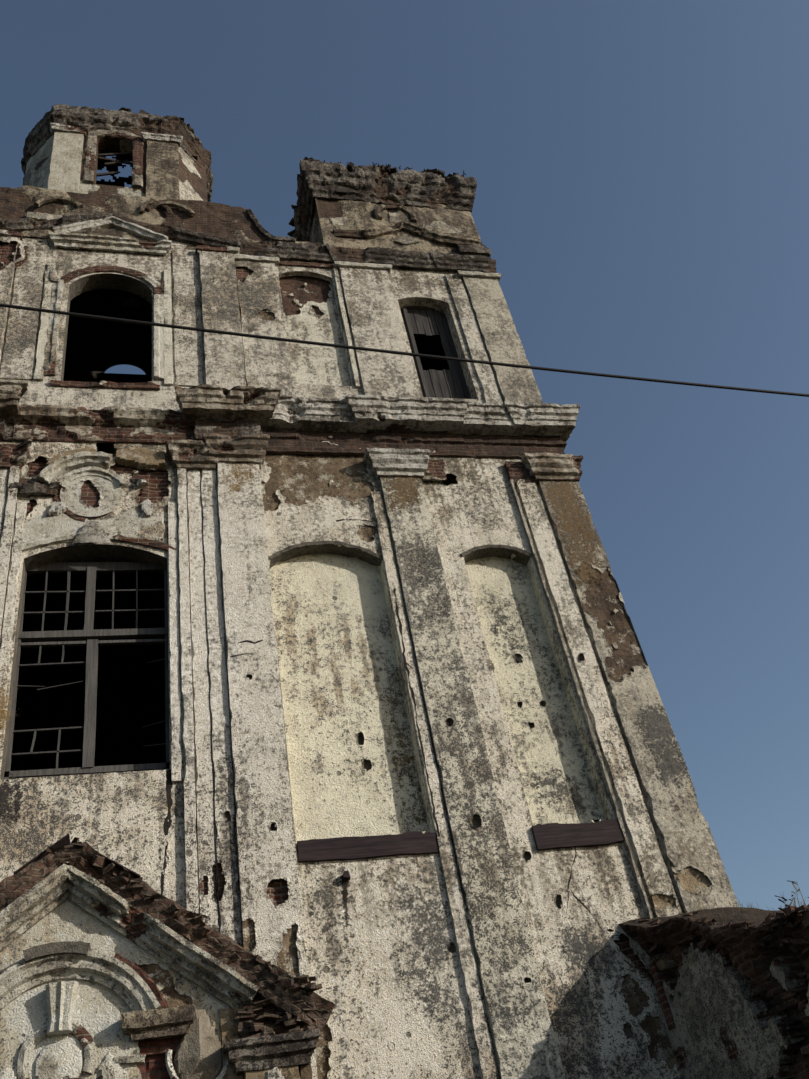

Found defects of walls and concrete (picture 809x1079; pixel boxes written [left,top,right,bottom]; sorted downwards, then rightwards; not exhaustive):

flaking render [0,239,28,271]
flaking render [255,274,333,321]
flaking render [25,498,39,519]
flaking render [22,454,51,479]
flaking render [78,478,104,517]
flaking render [96,443,174,506]
peeling [570,552,649,686]
crack [393,588,440,837]
damp [633,695,696,796]
flaking render [648,863,714,913]
peeling [602,924,809,1079]
flaking render [131,1037,182,1079]